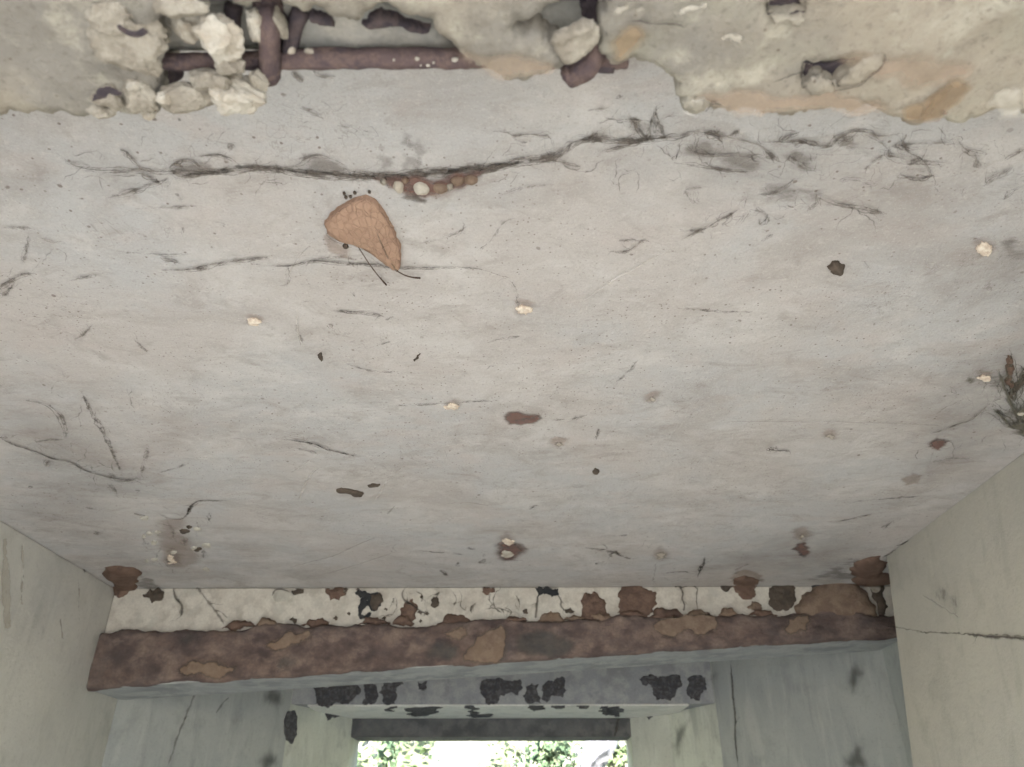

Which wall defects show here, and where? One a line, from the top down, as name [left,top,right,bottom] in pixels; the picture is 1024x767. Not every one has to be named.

spalling [84,0,486,121]
spalling [540,0,629,88]
corrosion [505,412,540,425]
corrosion [930,439,947,450]
peeling [290,587,470,627]
spalling [523,586,657,622]
spalling [720,575,796,611]
corrosion [87,611,897,691]
peeling [314,682,443,721]
peeling [464,676,624,718]
peeling [639,674,707,701]
crack [730,670,738,761]